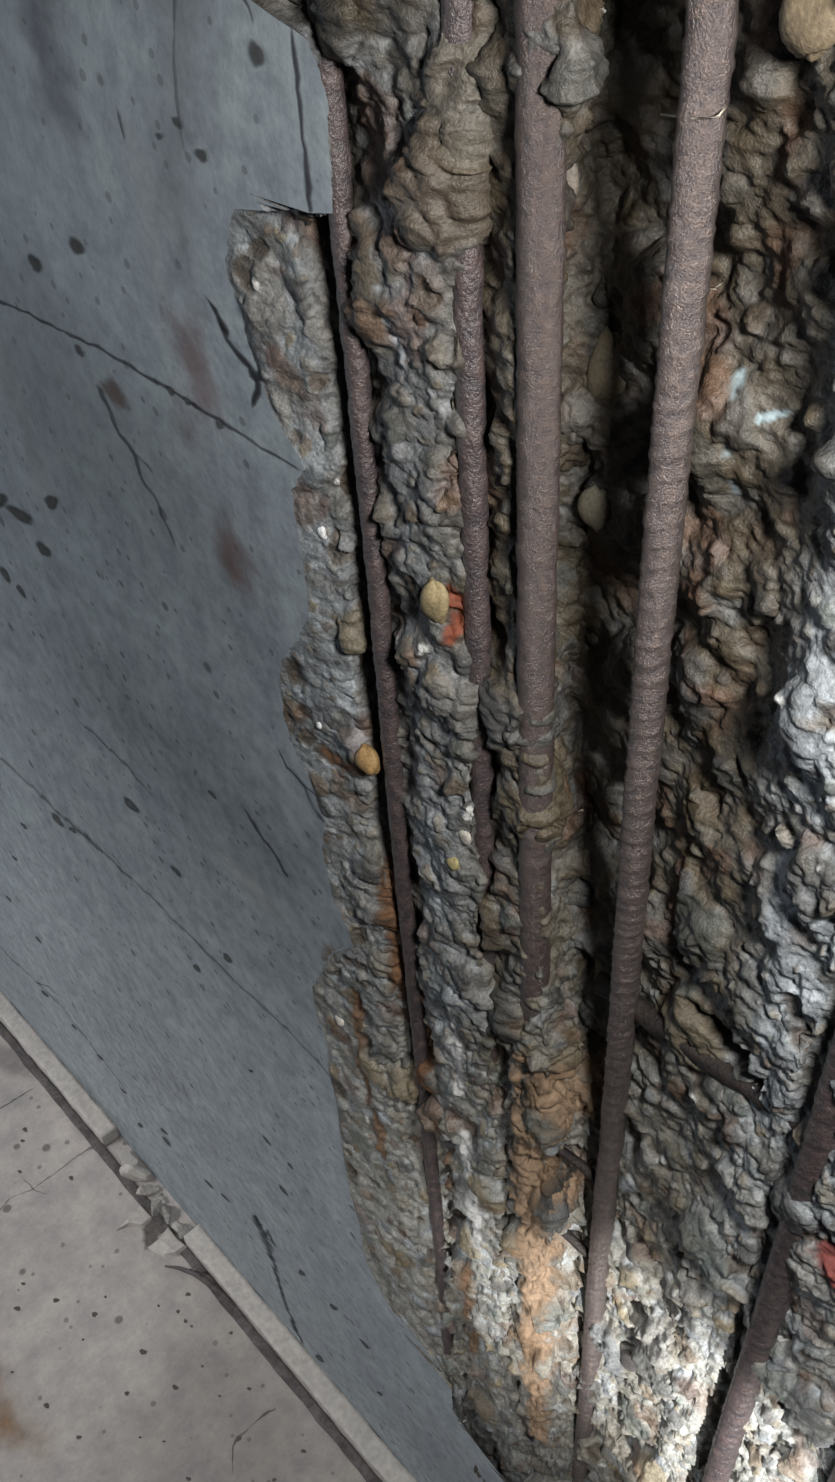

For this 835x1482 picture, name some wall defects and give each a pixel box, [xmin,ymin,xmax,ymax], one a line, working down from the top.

crack [0,299,296,542]
crack [244,809,288,876]
crack [280,754,328,822]
corrosion [323,749,385,777]
spalling [225,0,835,1482]
corrosion [377,831,424,1022]
corrosion [352,987,388,1159]
corrosion [415,1026,436,1093]
spalling [116,1205,187,1257]
crack [253,1213,303,1345]
corrosion [460,1262,479,1353]
corrosion [509,1052,595,1443]